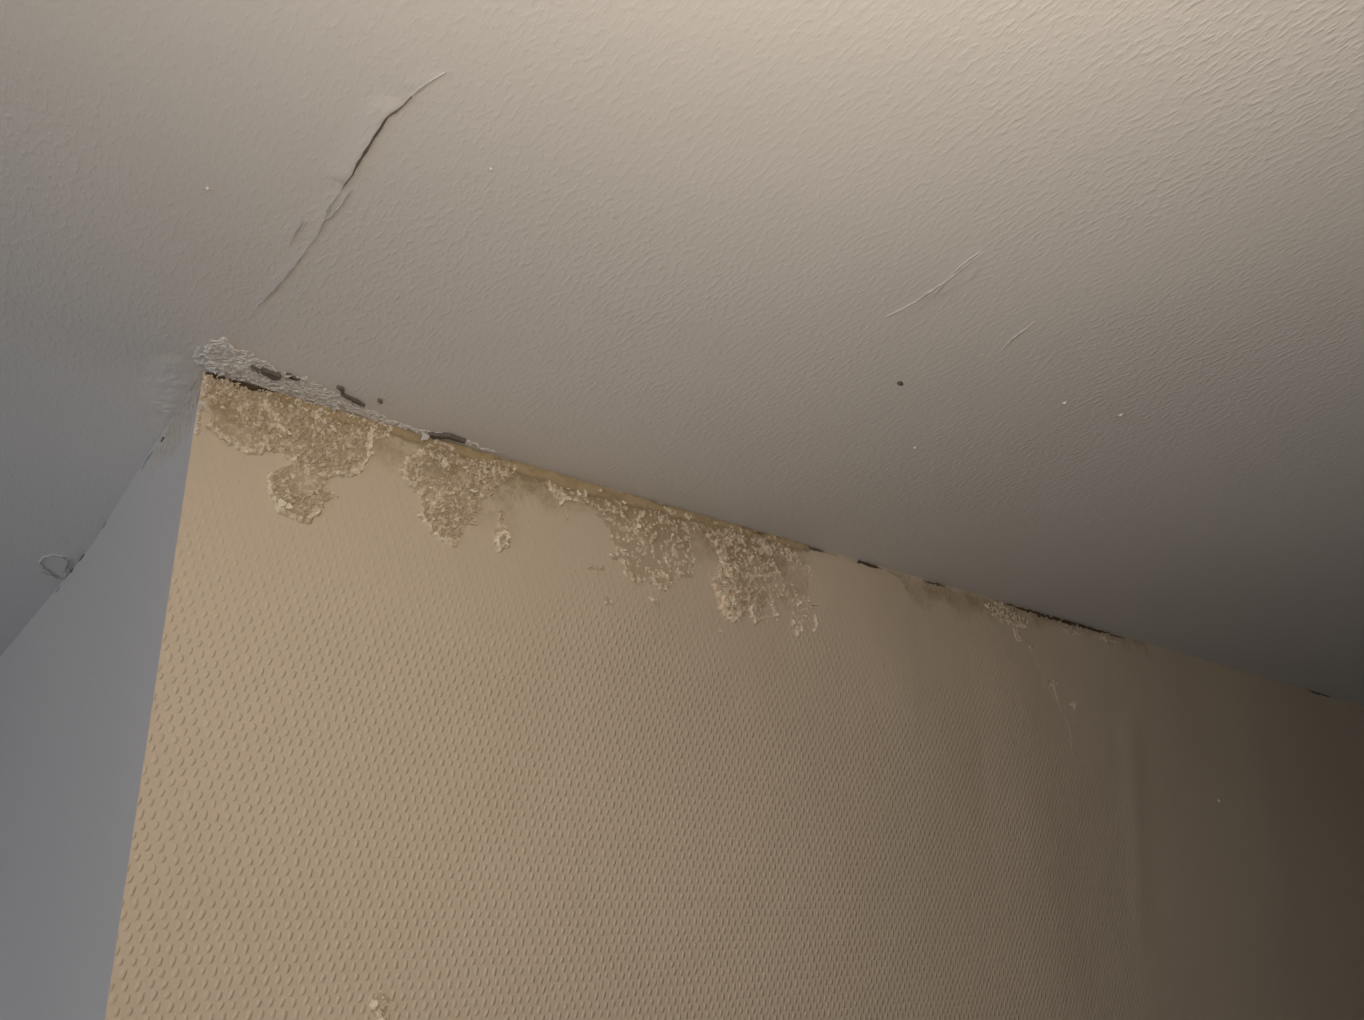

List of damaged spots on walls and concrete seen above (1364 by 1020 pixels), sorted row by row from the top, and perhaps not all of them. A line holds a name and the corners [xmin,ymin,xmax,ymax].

crack [251,67,445,306]
crack [886,252,989,317]
peeling [193,336,518,553]
peeling [544,481,819,638]